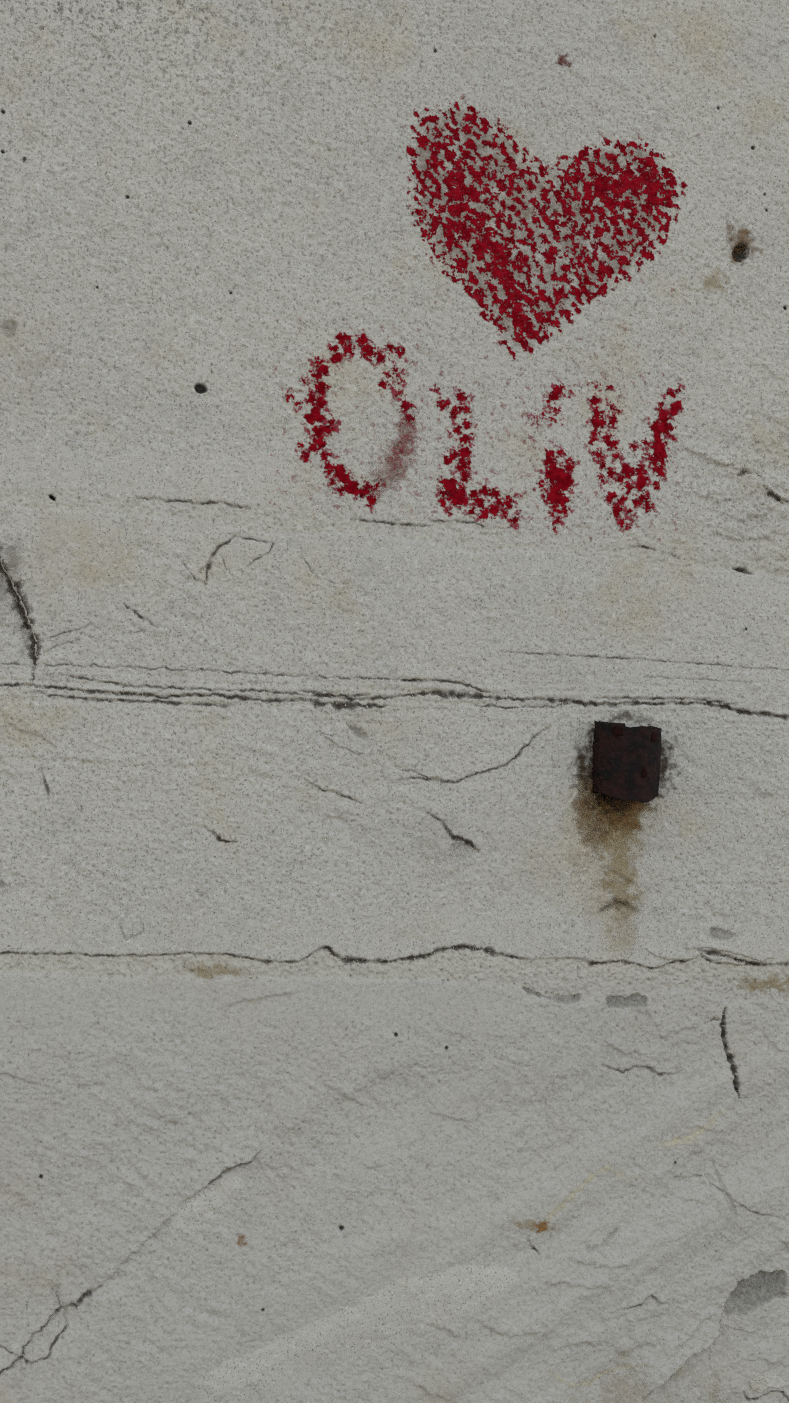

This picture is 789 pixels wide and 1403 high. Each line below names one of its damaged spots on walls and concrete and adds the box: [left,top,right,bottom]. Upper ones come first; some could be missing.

crack [146,498,273,579]
crack [0,559,787,719]
crack [412,745,528,782]
rust [577,712,681,888]
crack [226,945,517,963]
crack [589,951,787,969]
crack [711,1015,738,1092]
crack [0,1291,91,1373]